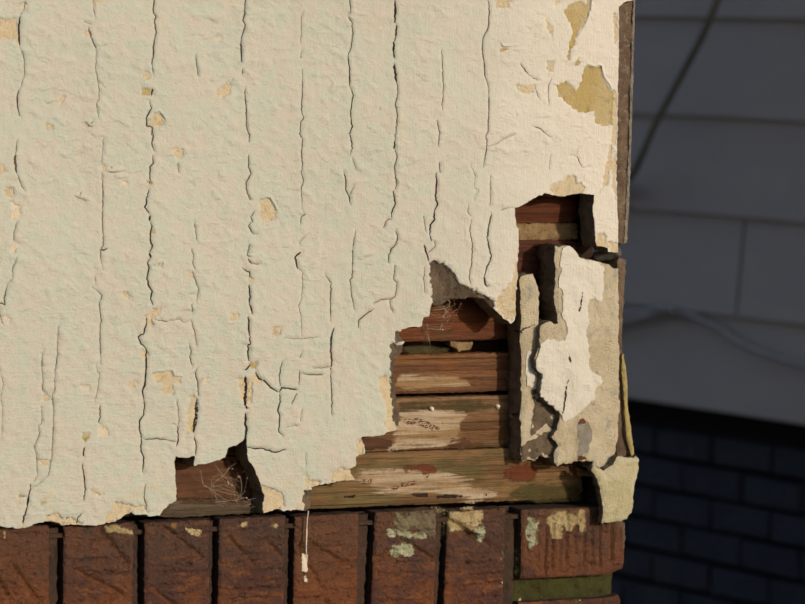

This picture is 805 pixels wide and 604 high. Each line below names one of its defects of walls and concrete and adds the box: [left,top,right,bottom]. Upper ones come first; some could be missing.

crack [17,5,25,116]
crack [138,1,199,509]
crack [243,0,398,453]
crack [423,121,441,291]
spalling [429,260,518,324]
crack [467,1,514,287]
peeling [533,0,618,253]
crack [22,330,59,524]
spalling [175,456,204,467]
spalling [234,437,354,514]
spalling [378,329,404,432]
peeling [587,454,639,524]